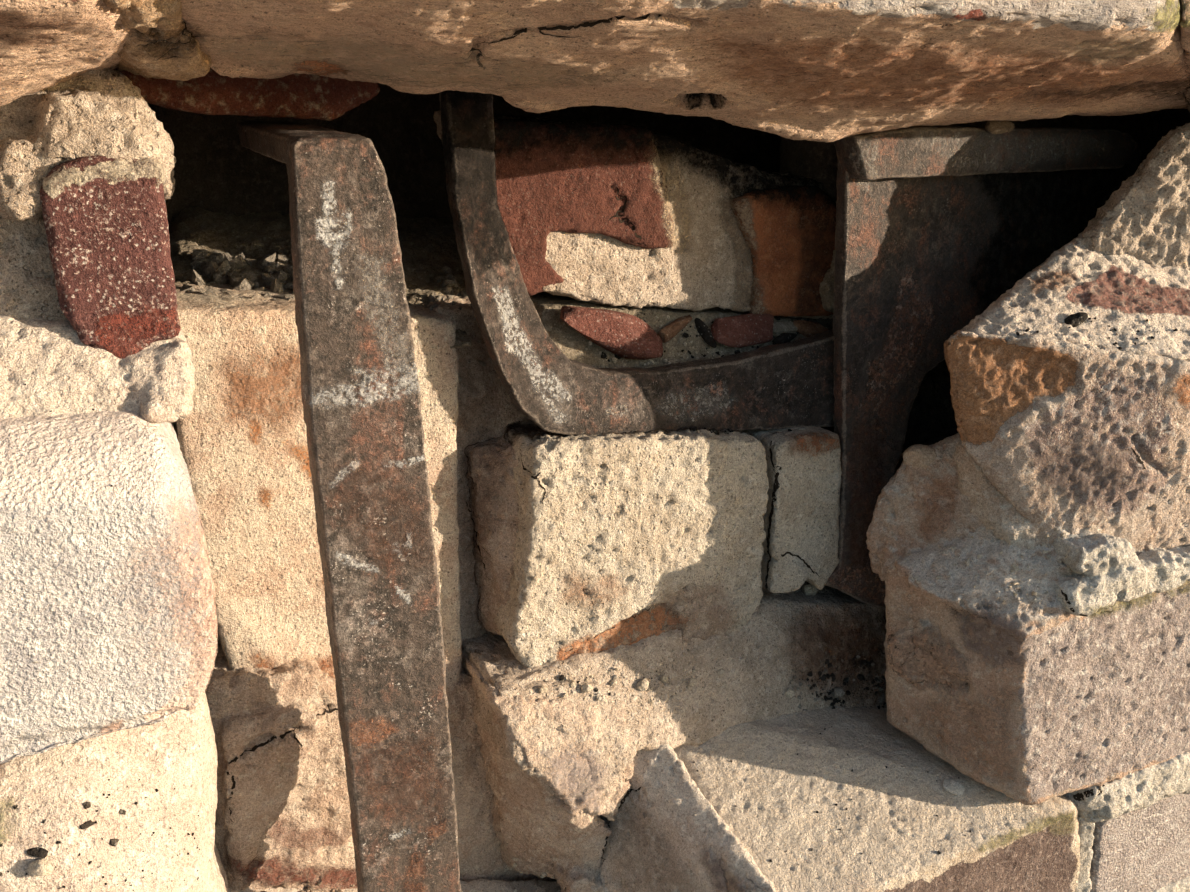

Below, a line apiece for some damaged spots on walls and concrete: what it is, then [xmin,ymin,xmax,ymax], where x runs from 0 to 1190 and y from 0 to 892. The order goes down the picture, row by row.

crack [469,14,673,70]
rust [291,446,312,478]
crack [765,441,820,591]
rust [787,424,886,703]
crack [227,704,338,822]